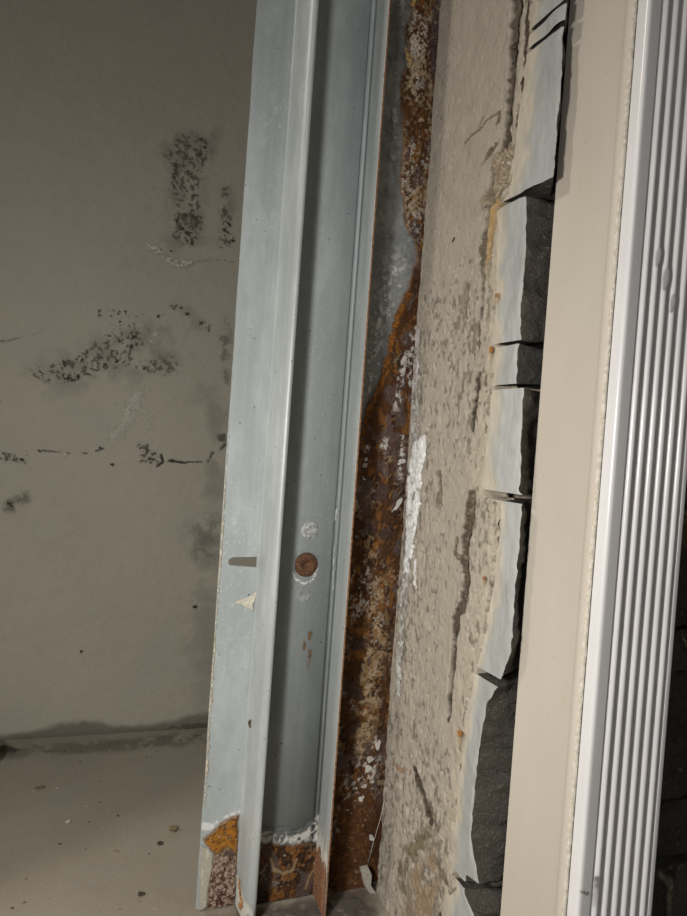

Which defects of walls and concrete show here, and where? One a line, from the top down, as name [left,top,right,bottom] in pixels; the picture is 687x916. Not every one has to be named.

mould [165,134,207,245]
mould [219,187,235,247]
mould [33,310,158,382]
corrosion [199,0,441,916]